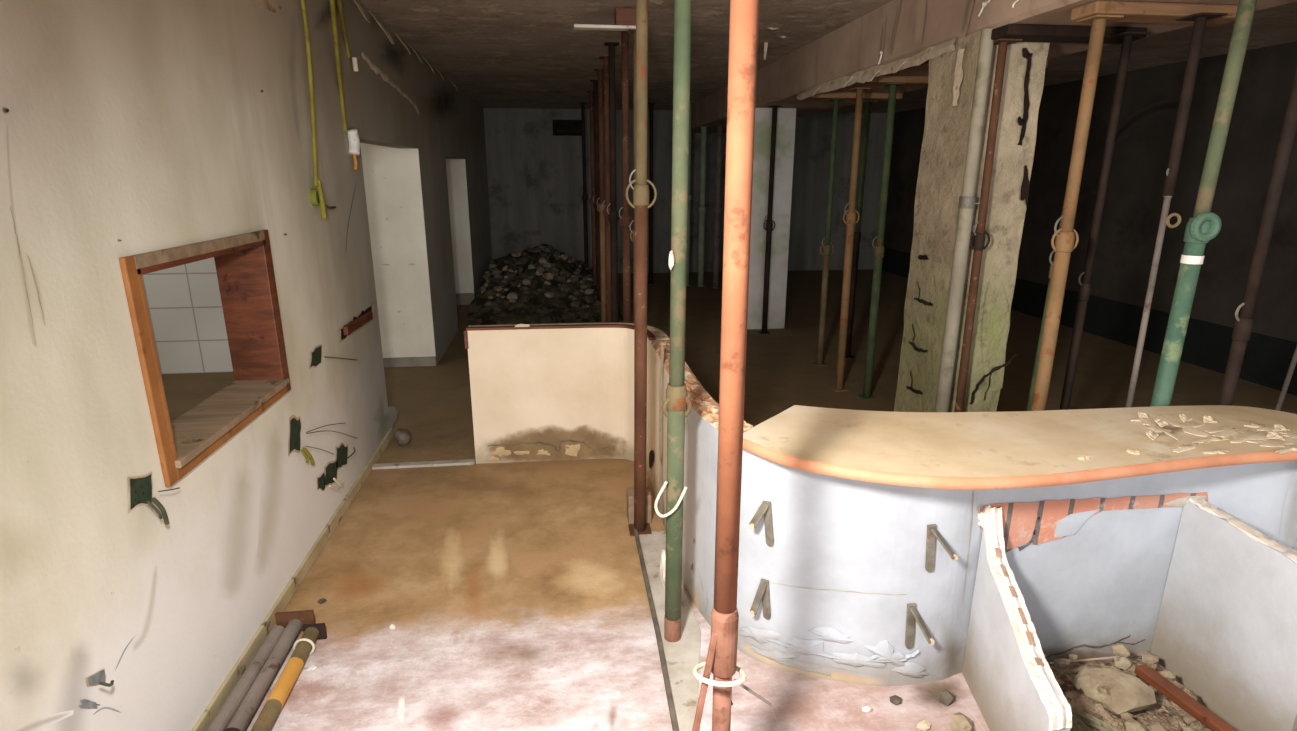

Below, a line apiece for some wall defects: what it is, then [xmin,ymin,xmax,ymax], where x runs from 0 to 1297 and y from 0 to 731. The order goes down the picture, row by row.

crack [906,284,933,395]
crack [969,354,1017,404]
water stain [417,422,633,503]
spalling [978,492,1297,731]